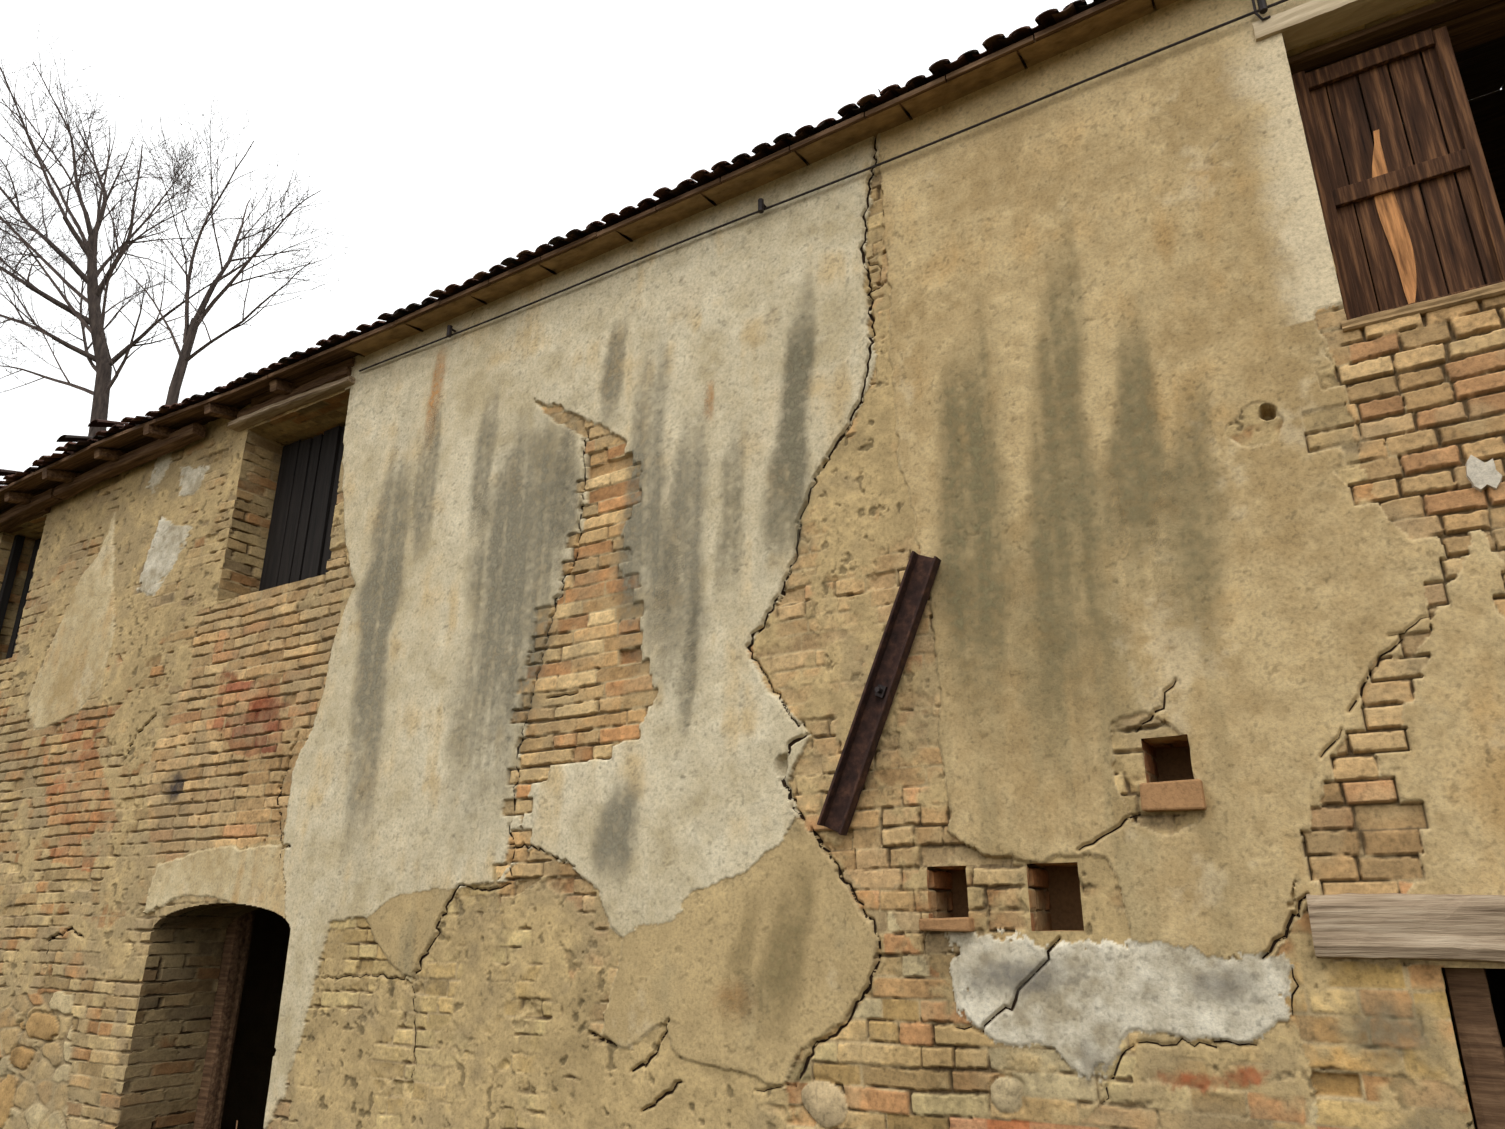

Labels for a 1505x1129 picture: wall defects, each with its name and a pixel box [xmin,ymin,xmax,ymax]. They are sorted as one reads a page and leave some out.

leakage [351,425,439,808]
leakage [460,424,576,739]
leakage [597,794,635,867]
leakage [622,404,702,704]
leakage [768,319,812,536]
spalling [267,176,1313,1129]
crack [747,138,881,1092]
leakage [941,371,1004,648]
leakage [1033,292,1198,648]
spalling [1288,294,1505,918]